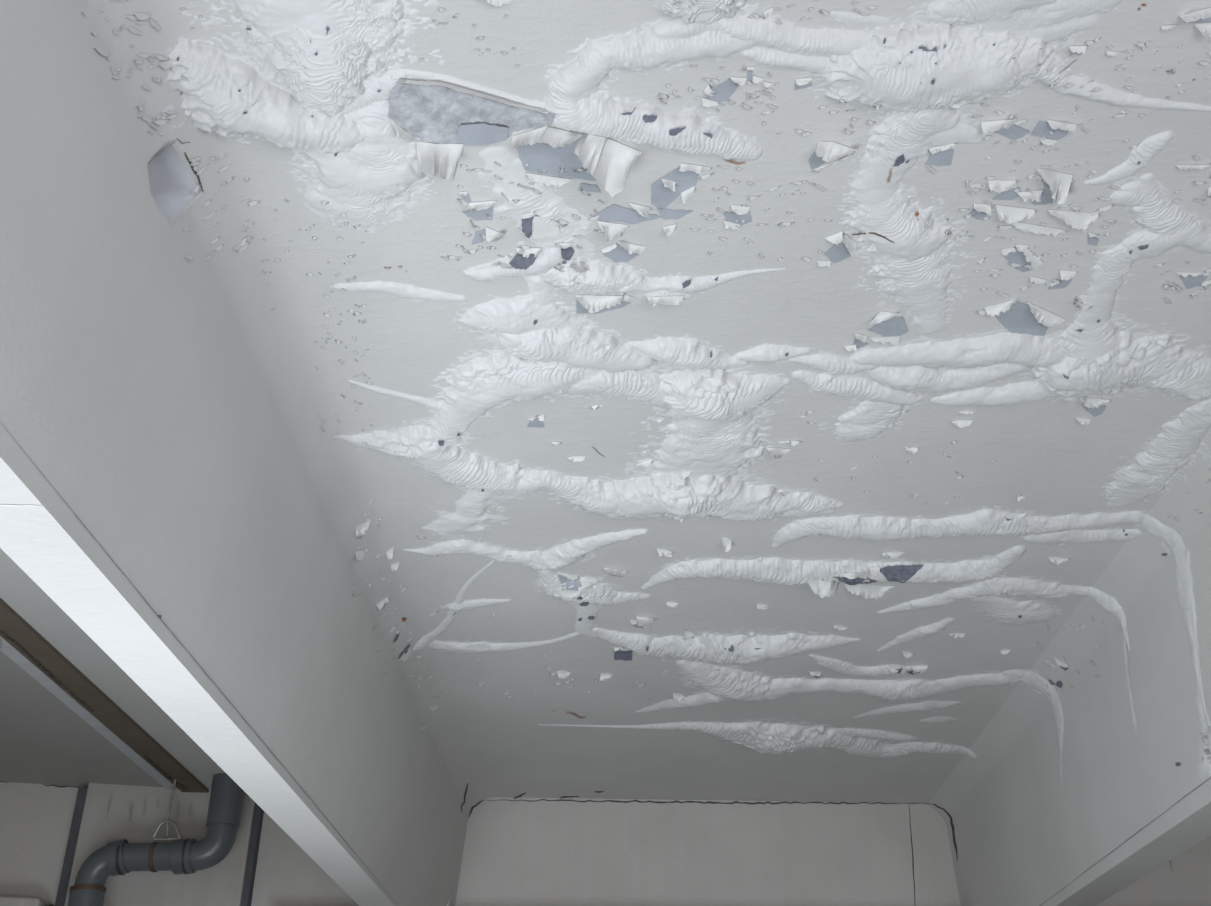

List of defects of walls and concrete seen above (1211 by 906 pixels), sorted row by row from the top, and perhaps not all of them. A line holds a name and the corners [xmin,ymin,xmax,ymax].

peeling [1037,37,1161,92]
peeling [1161,8,1211,79]
peeling [388,65,881,273]
peeling [925,143,955,174]
peeling [954,104,1121,336]
peeling [576,293,684,314]
peeling [1153,261,1211,303]
peeling [844,311,908,352]
crack [0,424,398,905]